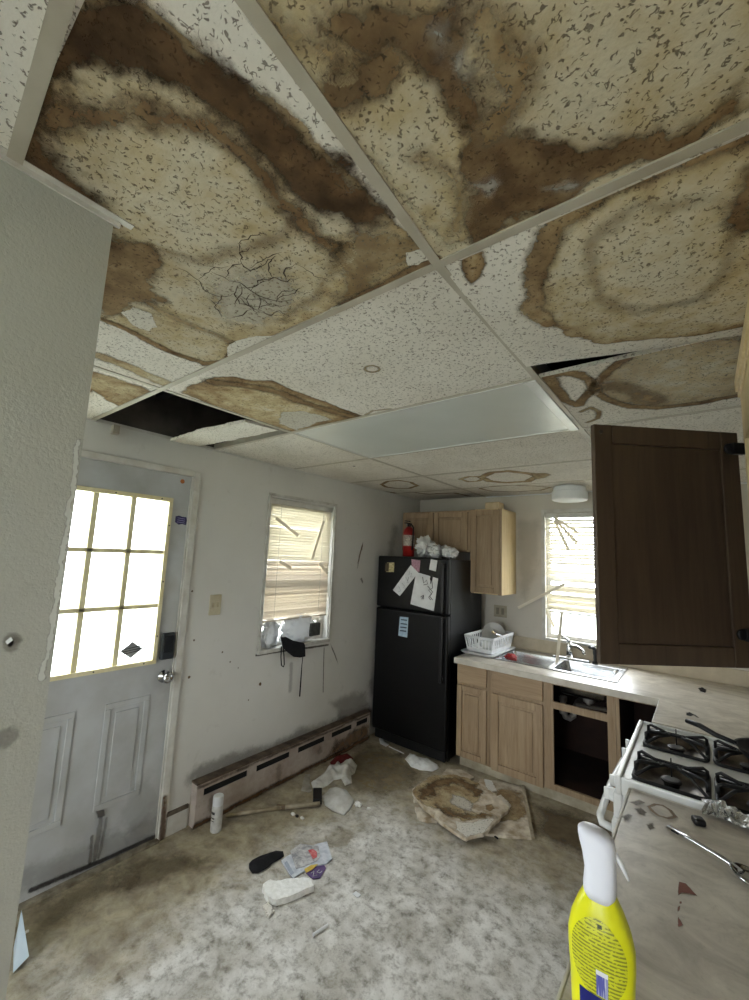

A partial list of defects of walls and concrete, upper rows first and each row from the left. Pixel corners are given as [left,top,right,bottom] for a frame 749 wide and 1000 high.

leakage [25,0,441,366]
leakage [257,0,749,423]
crack [179,233,329,317]
leakage [181,376,387,431]
leakage [459,470,552,492]